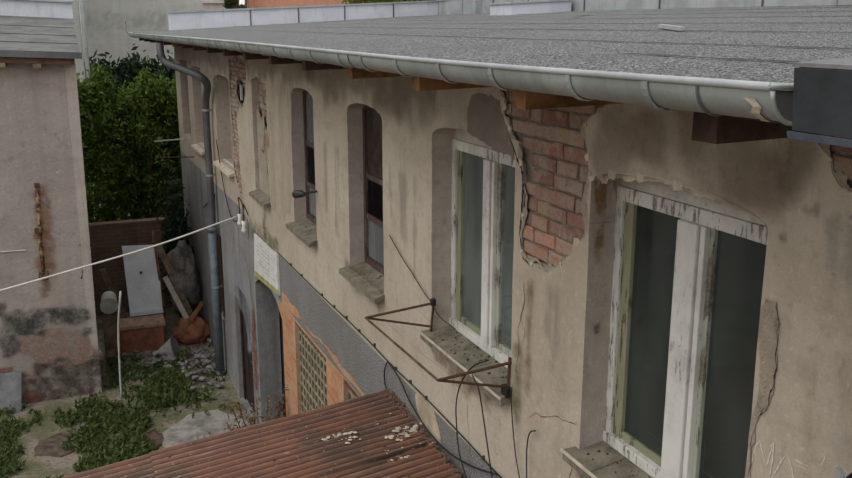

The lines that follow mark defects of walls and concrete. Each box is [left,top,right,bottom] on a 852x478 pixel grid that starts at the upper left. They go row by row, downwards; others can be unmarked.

rust [34,183,53,296]
spalling [229,56,247,206]
crack [511,141,529,265]
spalling [500,88,768,272]
spalling [813,135,852,197]
water stain [0,305,89,357]
peeling [745,298,780,478]